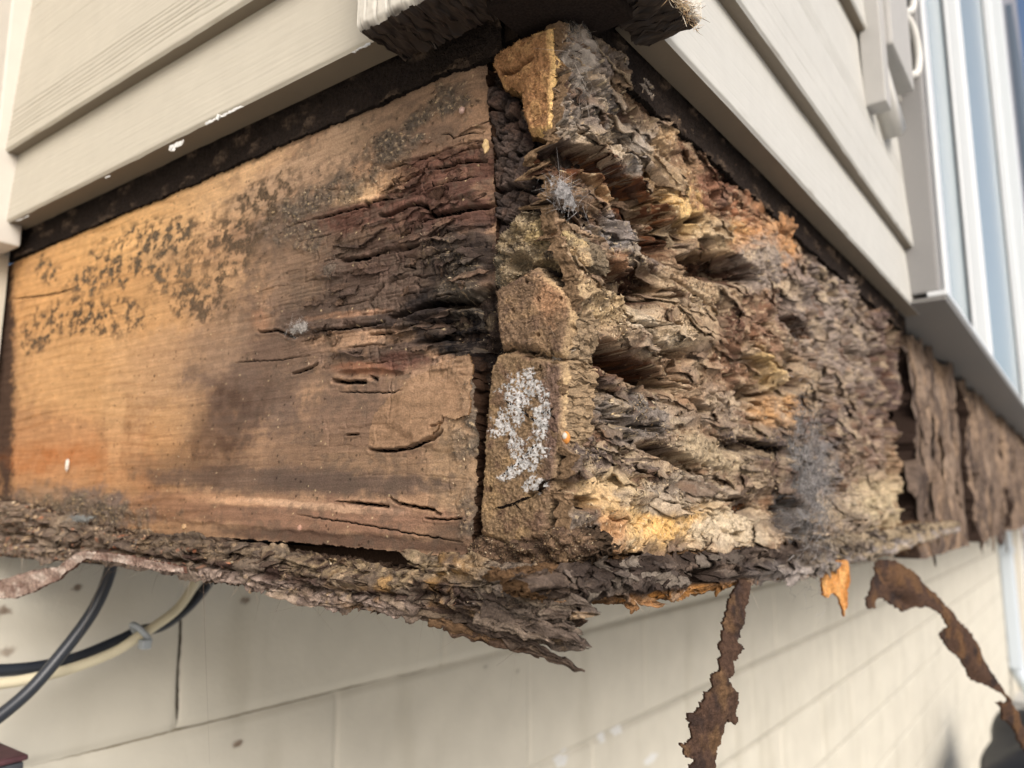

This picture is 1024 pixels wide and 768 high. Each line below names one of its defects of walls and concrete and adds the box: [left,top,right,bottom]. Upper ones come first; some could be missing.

crack [288,132,490,273]
spalling [533,154,674,249]
mould [21,174,295,354]
crack [322,302,475,343]
hole [779,316,810,339]
crack [239,330,397,394]
hole [590,358,657,382]
crack [376,423,443,453]
crack [301,500,462,542]
peeling [0,550,188,599]
peeling [678,579,751,768]
peeling [864,559,1024,750]